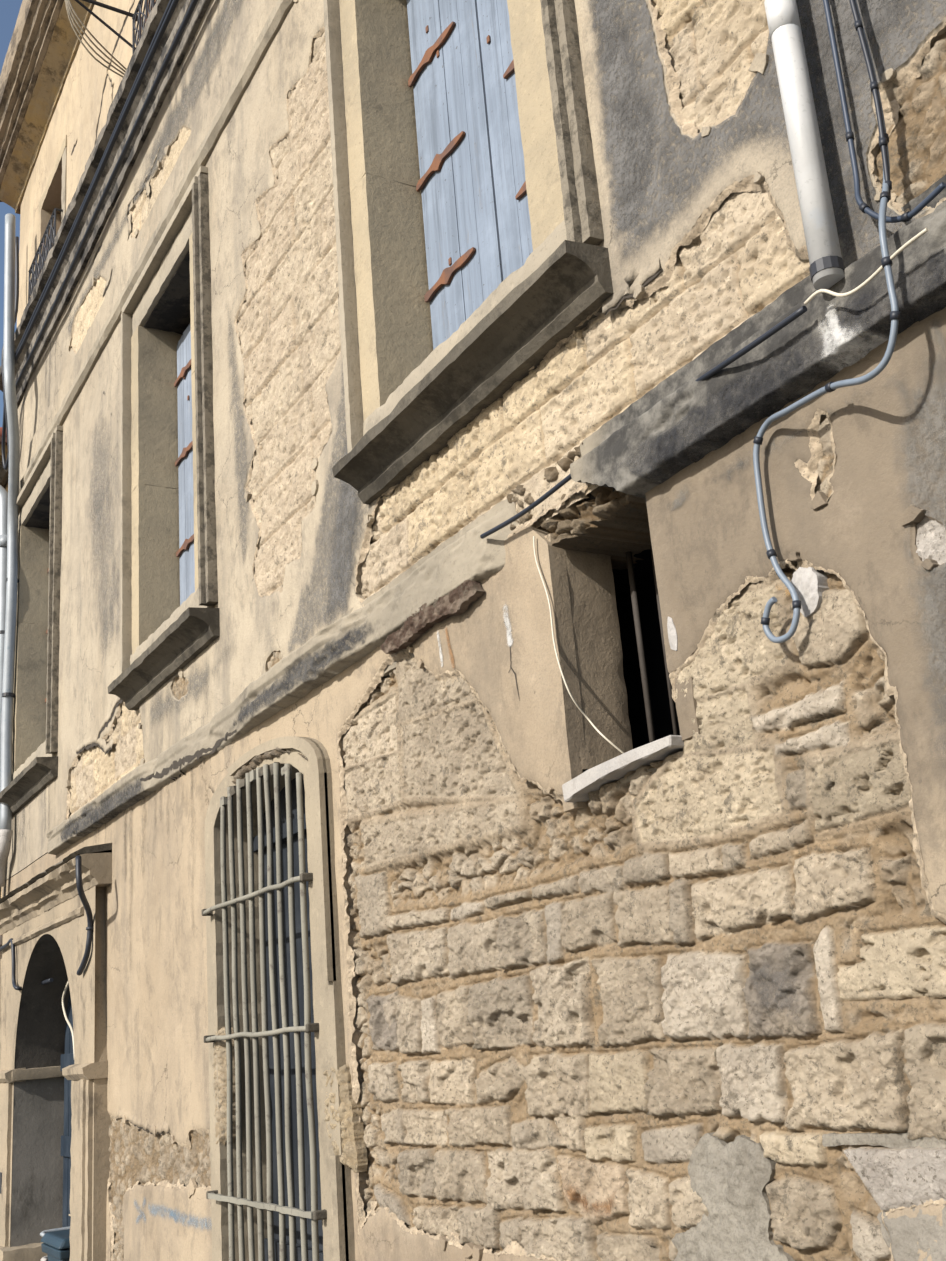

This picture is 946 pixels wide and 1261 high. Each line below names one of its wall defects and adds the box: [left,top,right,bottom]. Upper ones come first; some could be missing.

water stain [592,0,788,256]
spalling [648,0,769,137]
water stain [796,0,946,260]
spalling [869,23,946,214]
spalling [234,26,341,598]
spalling [355,172,810,607]
spalling [794,409,837,510]
spalling [65,701,145,819]
spalling [323,552,946,1261]
spalling [107,1027,236,1261]